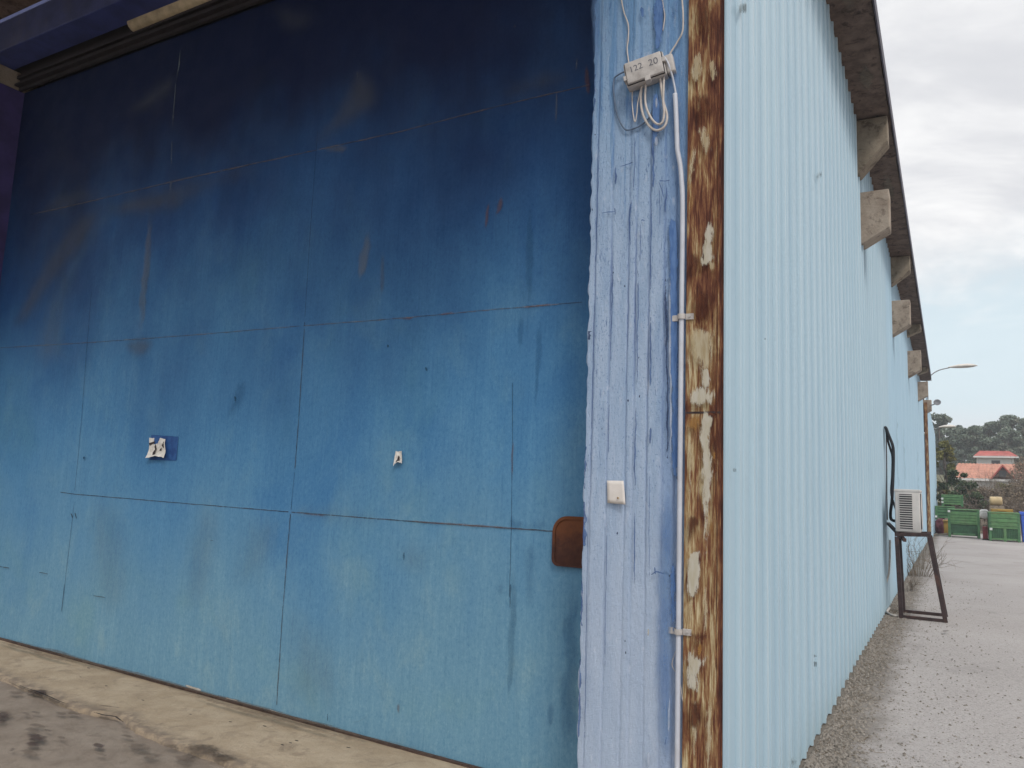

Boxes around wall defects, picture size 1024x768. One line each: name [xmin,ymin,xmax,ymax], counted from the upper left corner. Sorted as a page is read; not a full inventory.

peeling [692,53,717,81]
peeling [690,127,709,182]
rust [688,90,719,698]
damp [661,521,676,728]
rust [689,701,700,728]